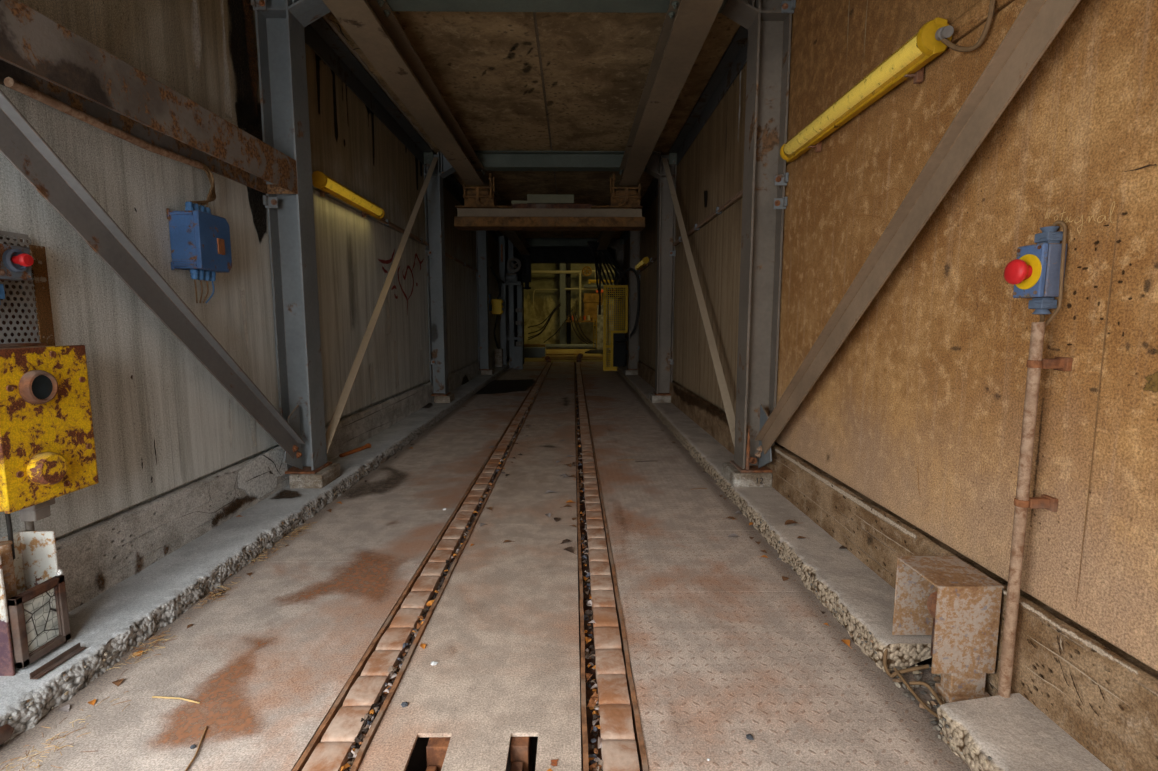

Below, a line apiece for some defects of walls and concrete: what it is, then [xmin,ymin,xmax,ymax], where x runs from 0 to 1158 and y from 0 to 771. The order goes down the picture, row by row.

leakage [222,0,263,141]
leakage [247,186,267,243]
corrosion [282,552,397,602]
corrosion [158,640,268,744]